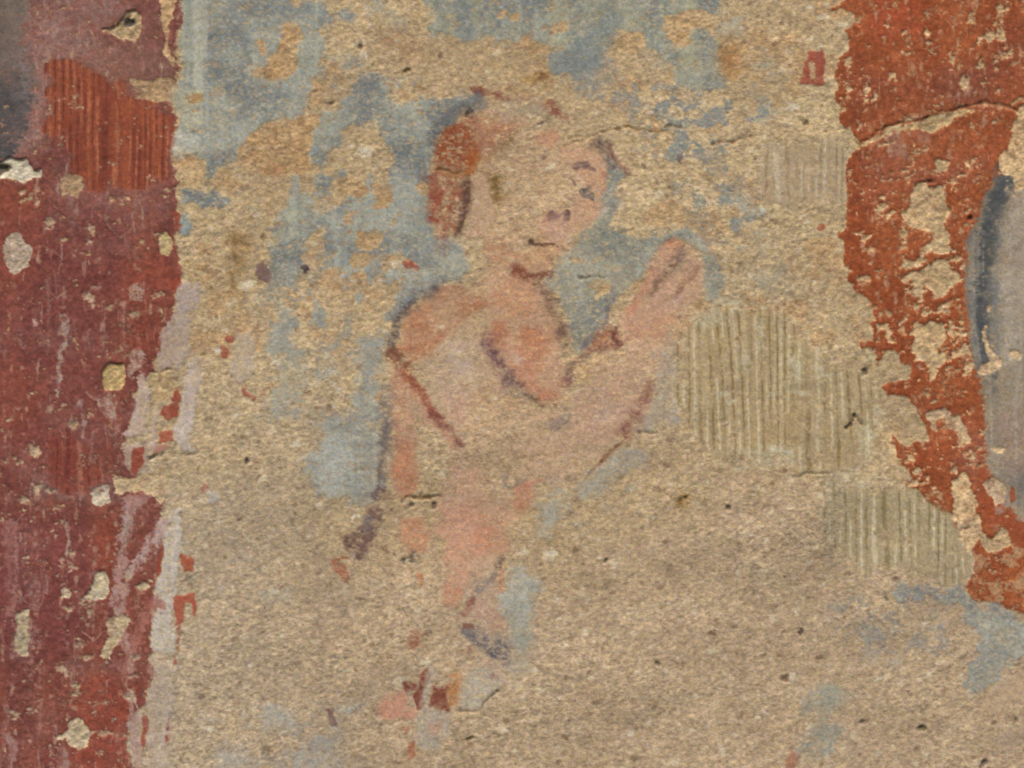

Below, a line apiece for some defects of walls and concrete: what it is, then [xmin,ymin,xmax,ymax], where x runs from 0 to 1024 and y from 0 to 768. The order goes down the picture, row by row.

spalling [69,11,143,43]
peeling [921,0,1024,95]
spalling [0,131,69,242]
peeling [55,158,126,198]
crack [823,101,1018,151]
peeling [935,97,1024,197]
peeling [0,231,33,295]
spalling [97,342,133,392]
spalling [0,483,110,627]
peeling [2,606,43,683]
peeling [74,614,131,666]
spalling [45,713,117,757]